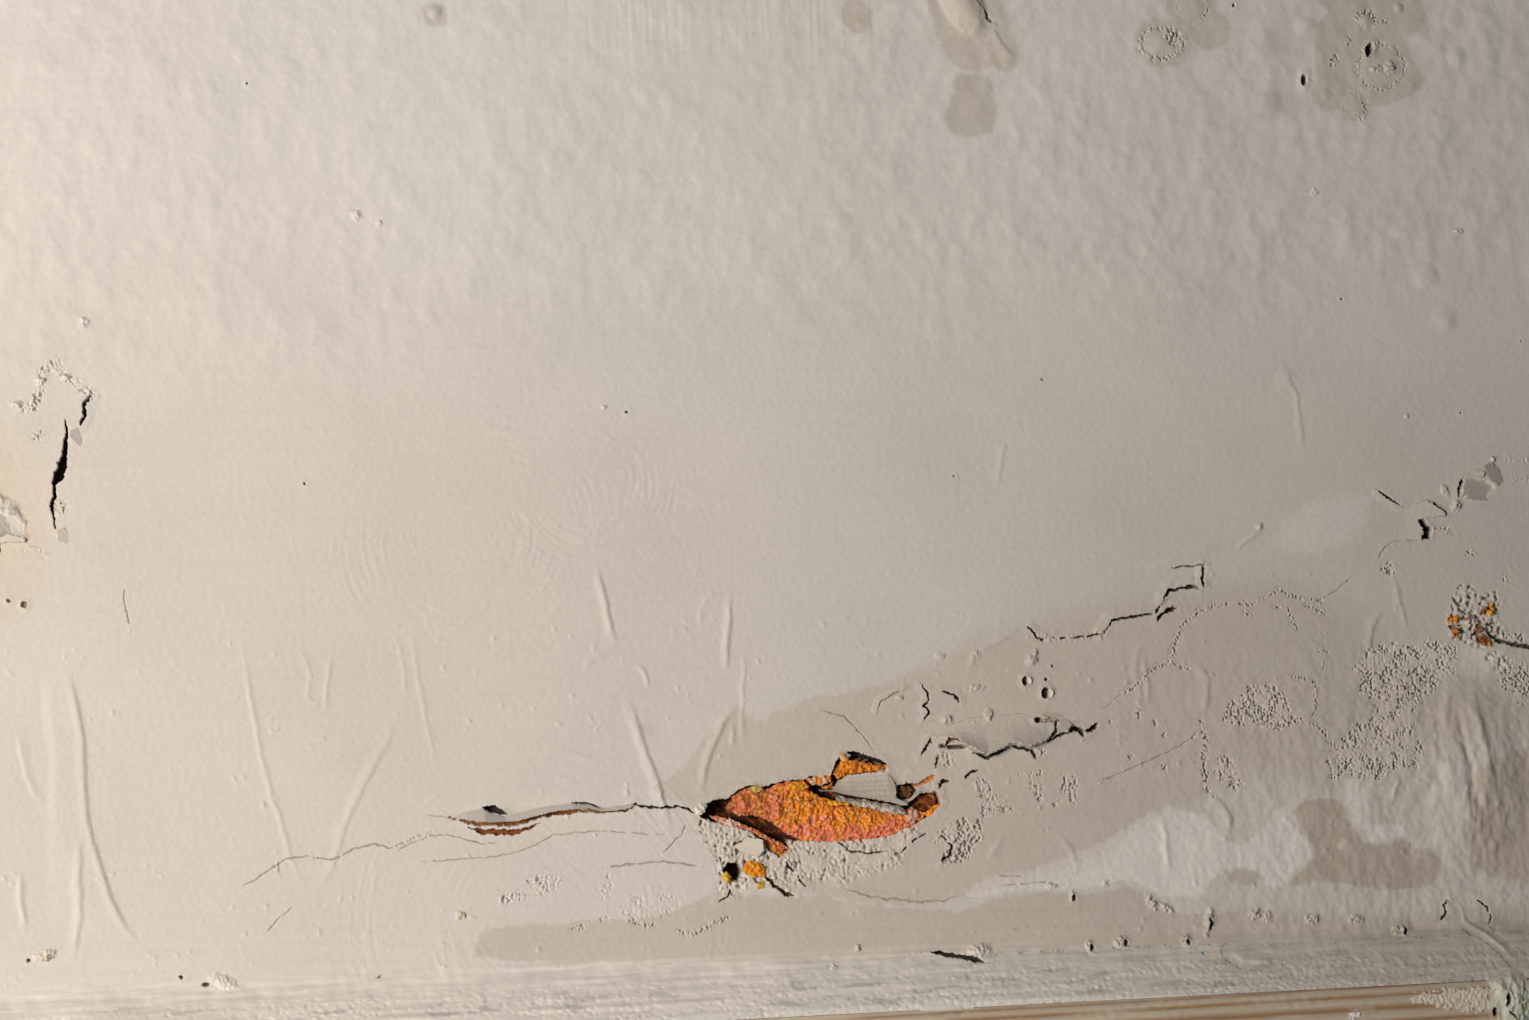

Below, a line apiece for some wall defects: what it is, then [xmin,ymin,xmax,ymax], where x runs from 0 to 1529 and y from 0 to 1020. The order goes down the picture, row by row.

leakage [838,0,874,36]
leakage [928,0,1009,142]
spalling [2,593,33,615]
spalling [0,487,52,577]
crack [39,390,101,543]
crack [814,556,1358,773]
peeling [1440,454,1529,513]
crack [228,793,711,941]
spalling [689,743,1086,911]
leakage [473,796,1529,967]